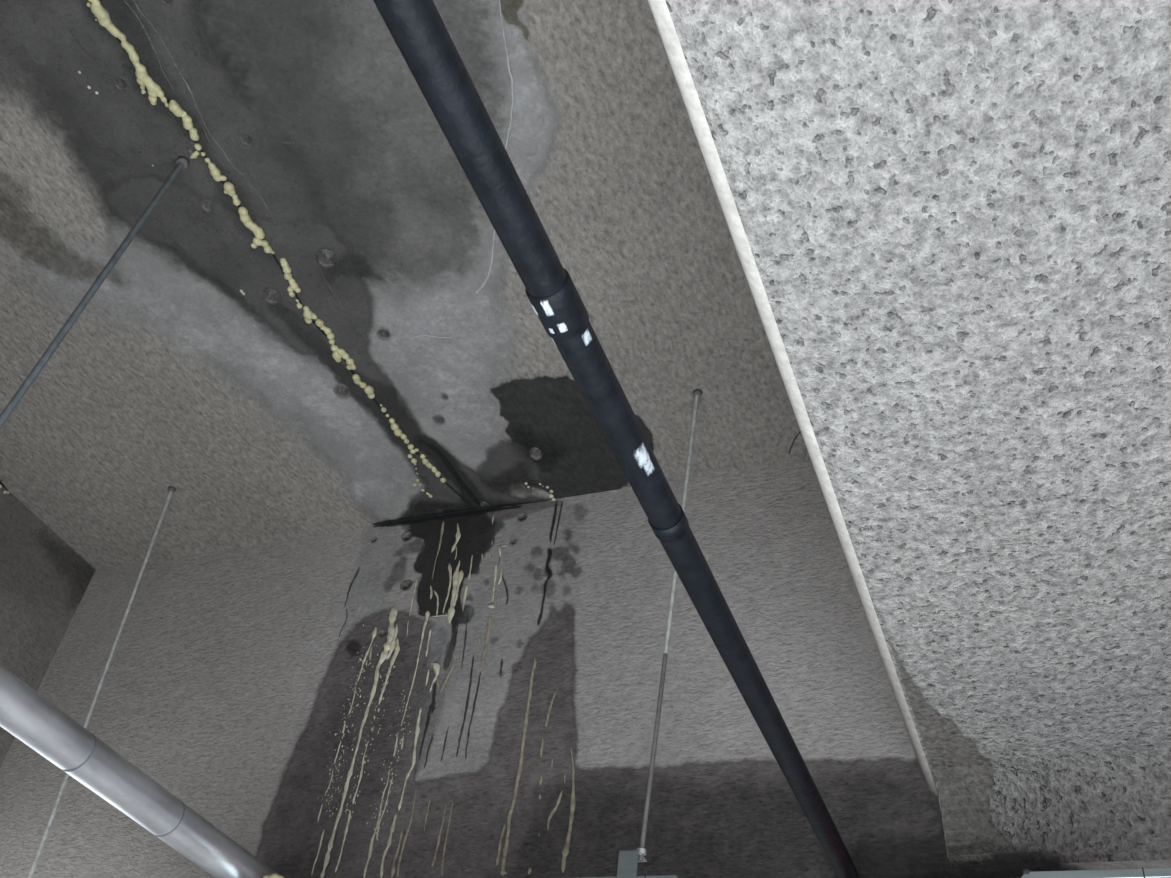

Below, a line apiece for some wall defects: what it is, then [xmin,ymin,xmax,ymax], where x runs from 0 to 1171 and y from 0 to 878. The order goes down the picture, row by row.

crack [116,0,267,207]
crack [252,232,354,375]
leakage [0,0,838,878]
crack [373,440,549,527]
leakage [804,639,1068,878]